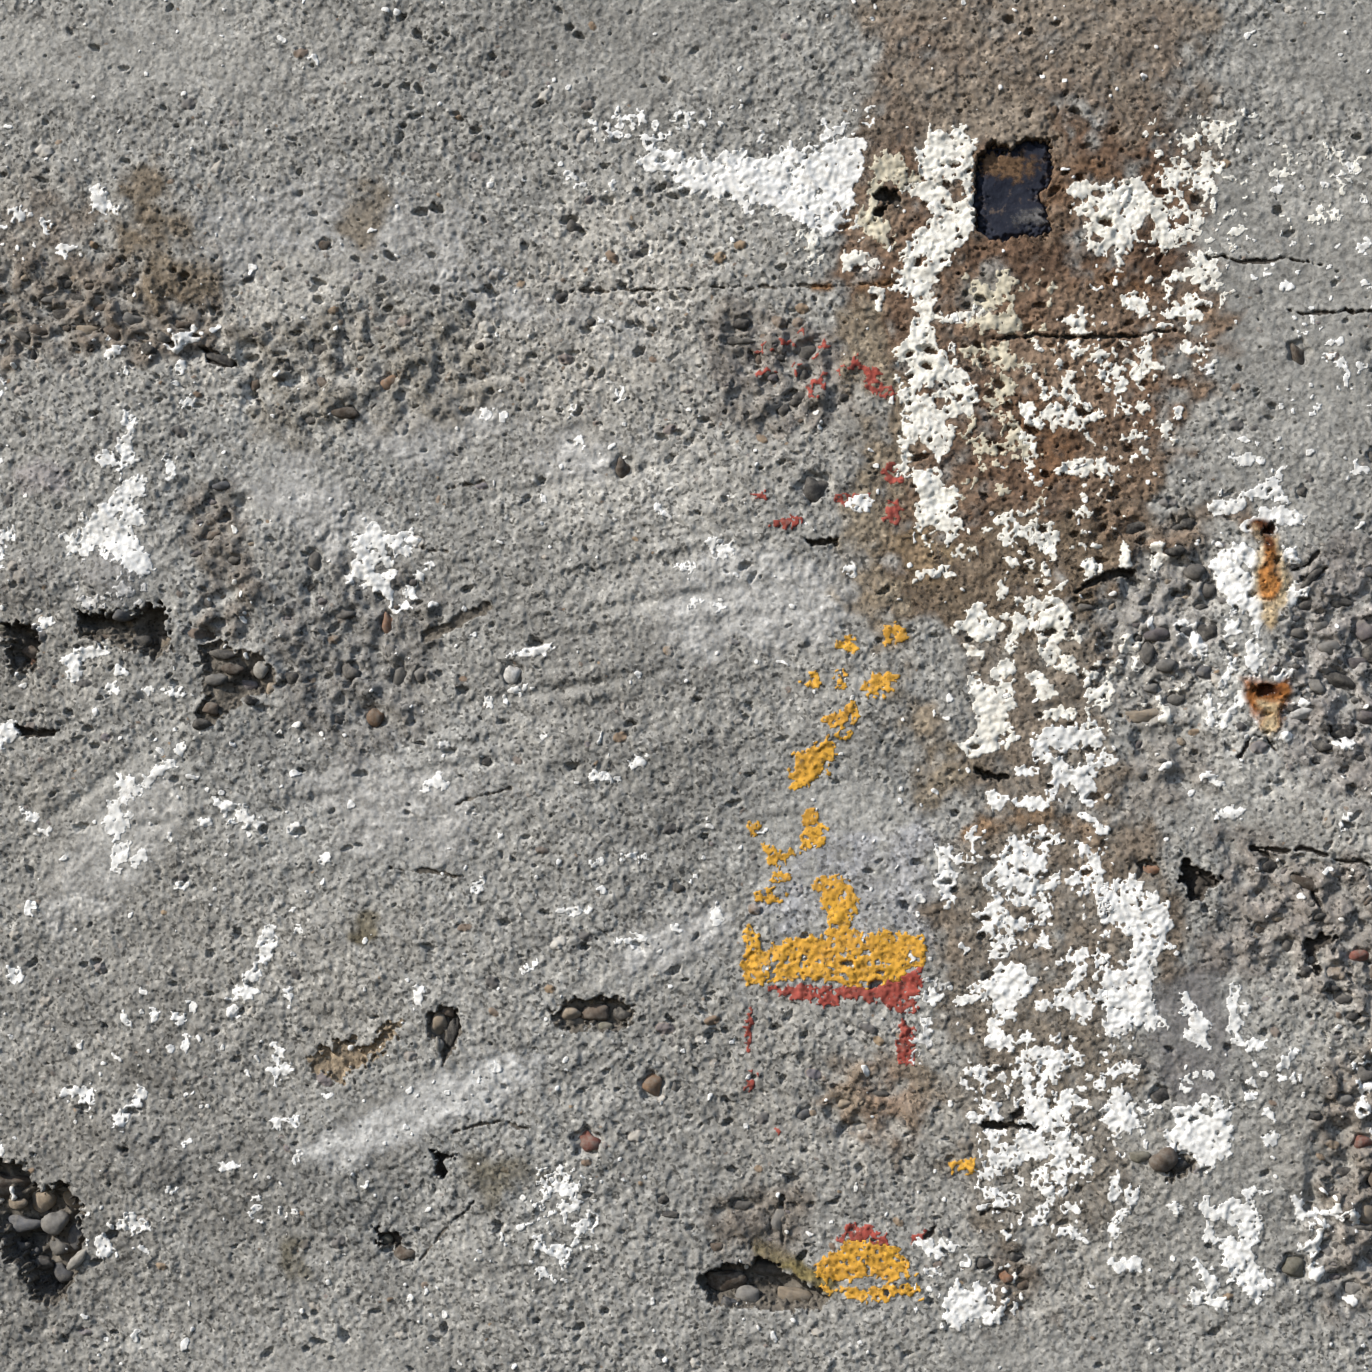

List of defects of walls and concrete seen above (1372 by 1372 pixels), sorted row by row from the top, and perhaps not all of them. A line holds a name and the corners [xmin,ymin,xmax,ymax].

crack [993,328,1176,341]
crack [1205,255,1323,266]
crack [1288,307,1372,316]
peeling [58,409,179,696]
corrosion [812,0,1291,1232]
peeling [101,481,443,875]
peeling [587,99,1372,1332]
crack [1249,845,1370,908]
peeling [224,907,303,1019]
spalling [265,984,462,1100]
spalling [548,994,636,1034]
spalling [0,1144,151,1309]